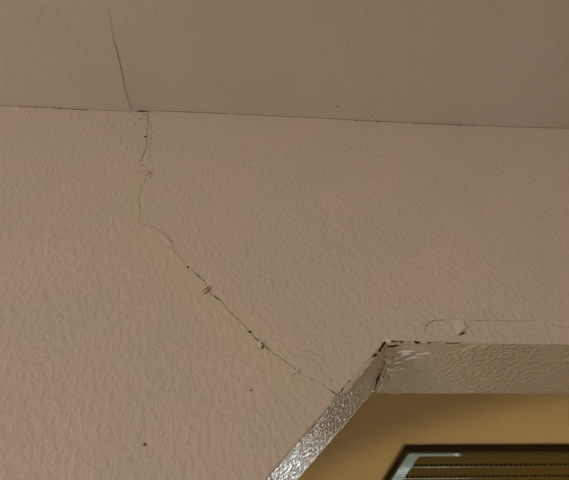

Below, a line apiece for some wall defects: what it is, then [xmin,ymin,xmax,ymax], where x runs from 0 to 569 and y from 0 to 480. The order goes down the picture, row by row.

crack [109,10,478,395]